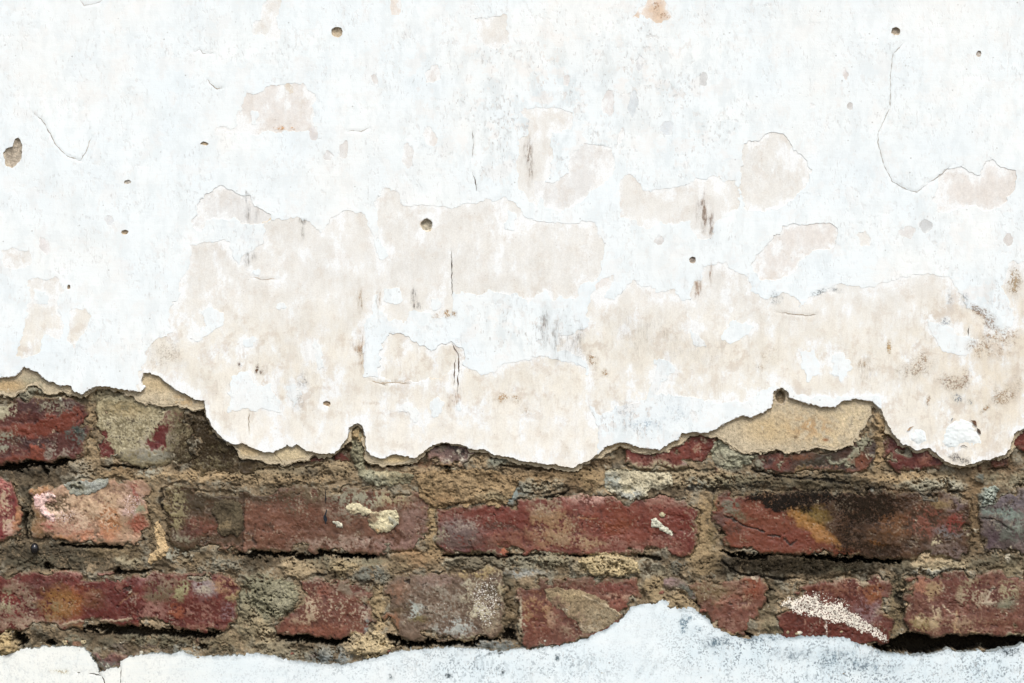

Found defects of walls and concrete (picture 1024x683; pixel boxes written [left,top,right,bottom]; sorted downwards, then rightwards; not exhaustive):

peeling [216,83,318,140]
crack [877,42,948,193]
peeling [0,107,1024,509]
spalling [33,492,56,521]
spalling [148,520,169,565]
spalling [345,503,399,534]
spalling [651,512,673,536]
spalling [578,552,640,577]
spalling [250,579,299,620]
spalling [545,586,621,633]
spalling [0,635,19,657]
spalling [350,630,394,659]